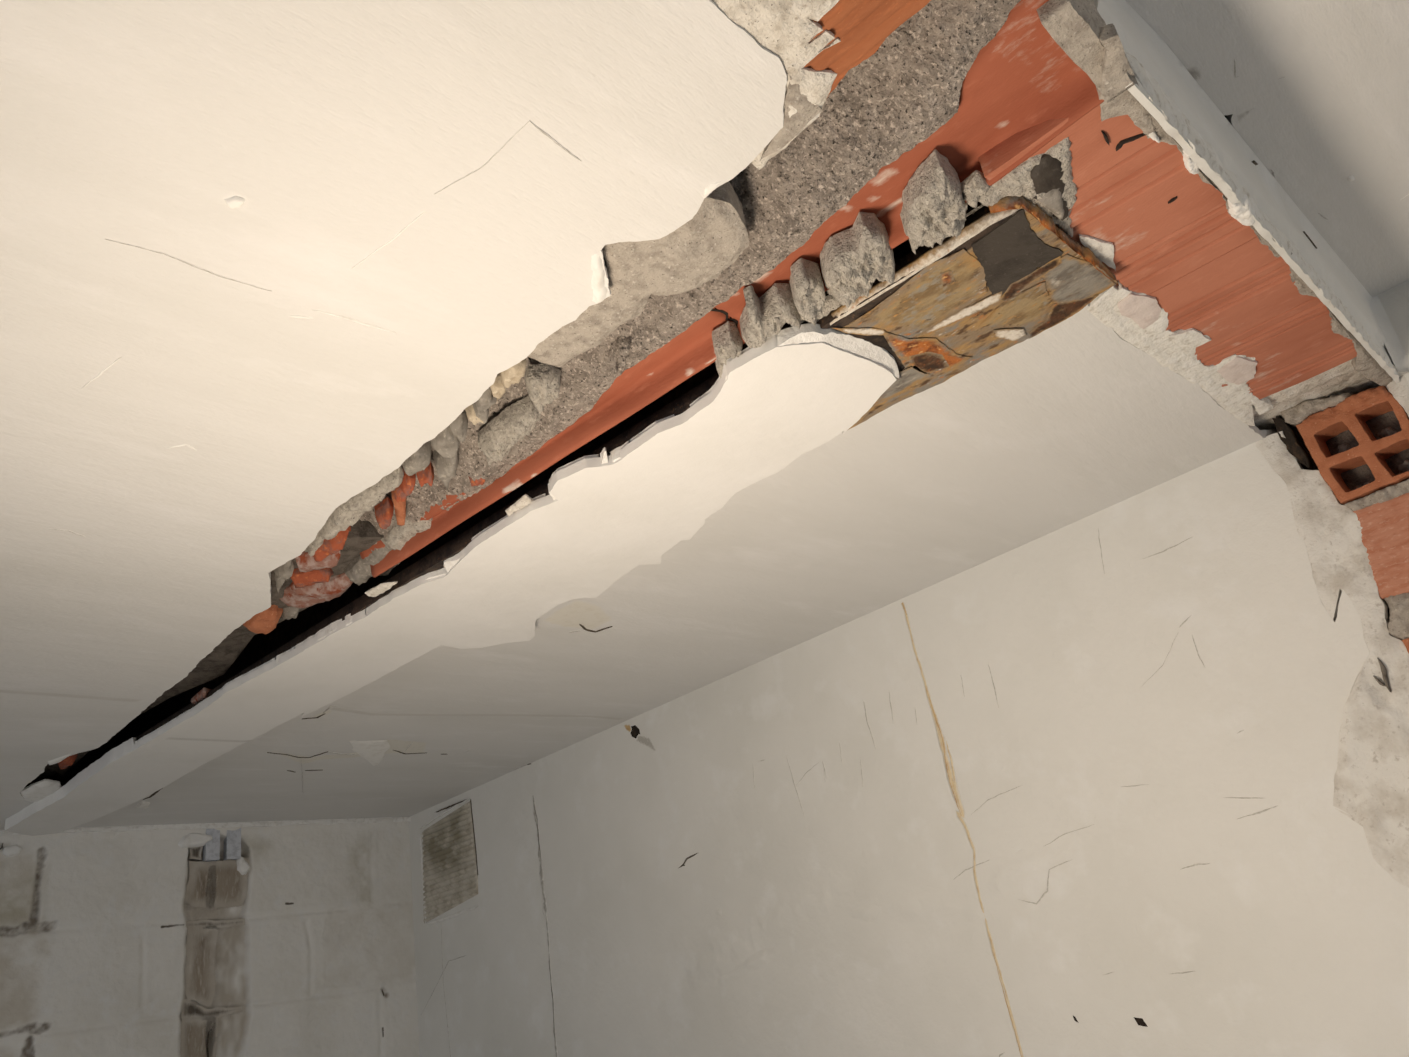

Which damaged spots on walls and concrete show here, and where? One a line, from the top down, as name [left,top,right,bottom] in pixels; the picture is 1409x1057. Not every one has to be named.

spalling [21,751,89,802]
spalling [133,0,1020,744]
flaking render [1037,0,1409,887]